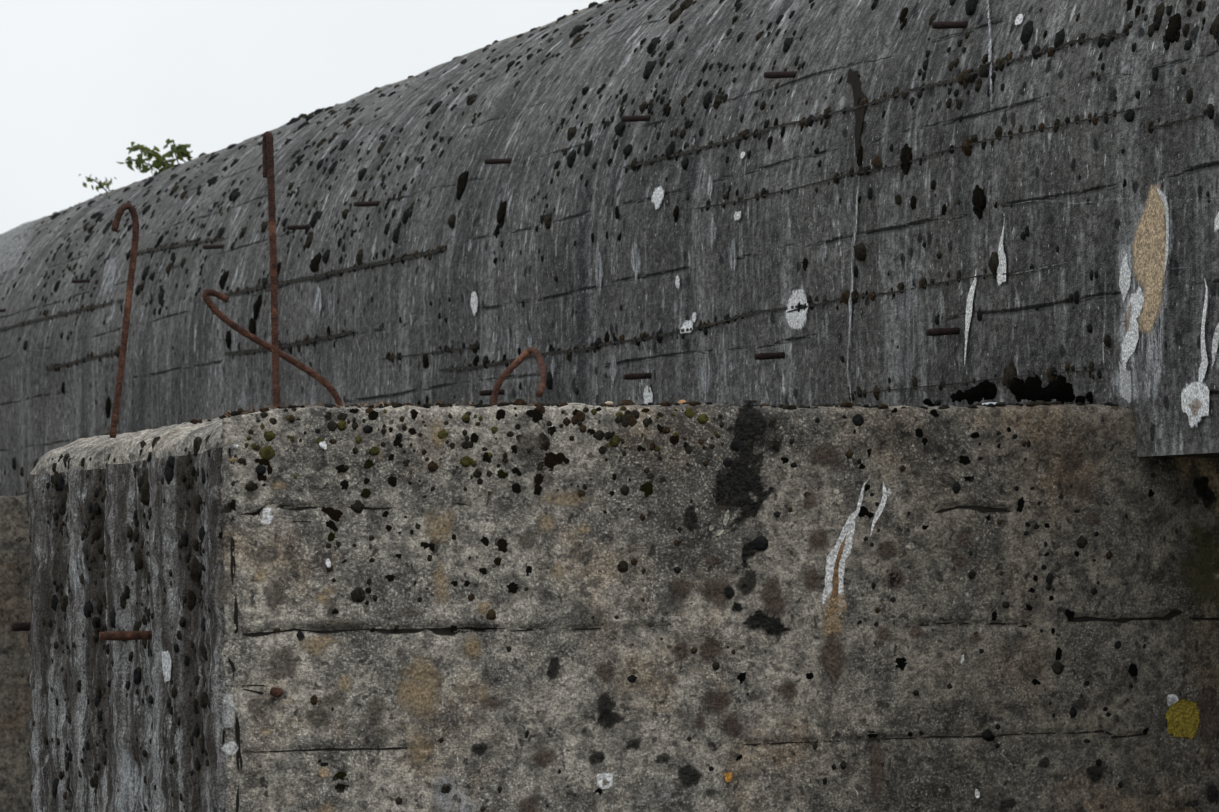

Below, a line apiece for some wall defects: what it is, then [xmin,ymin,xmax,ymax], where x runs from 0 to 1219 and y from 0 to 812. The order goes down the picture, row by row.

efflorescence [1181,278,1219,428]
water stain [821,478,902,686]